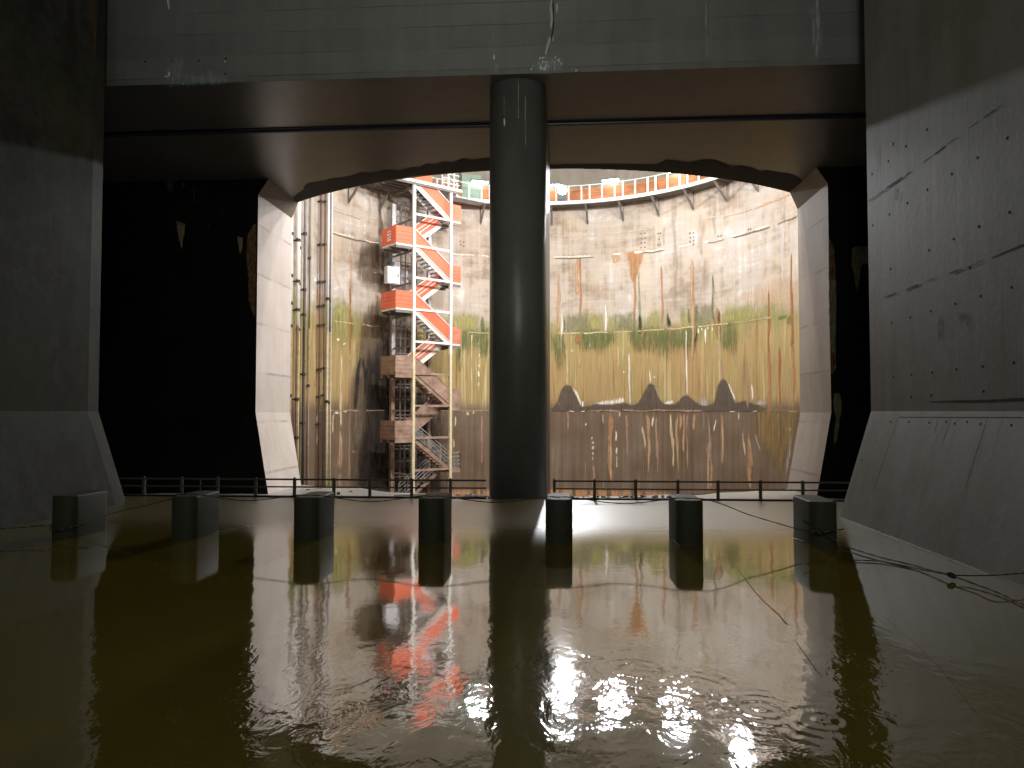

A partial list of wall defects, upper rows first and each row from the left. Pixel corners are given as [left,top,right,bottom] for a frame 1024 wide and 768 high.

crack [545,0,558,55]
crack [868,105,1001,202]
damp [358,198,389,285]
corrosion [613,252,643,328]
crack [884,244,1024,298]
damp [332,301,483,490]